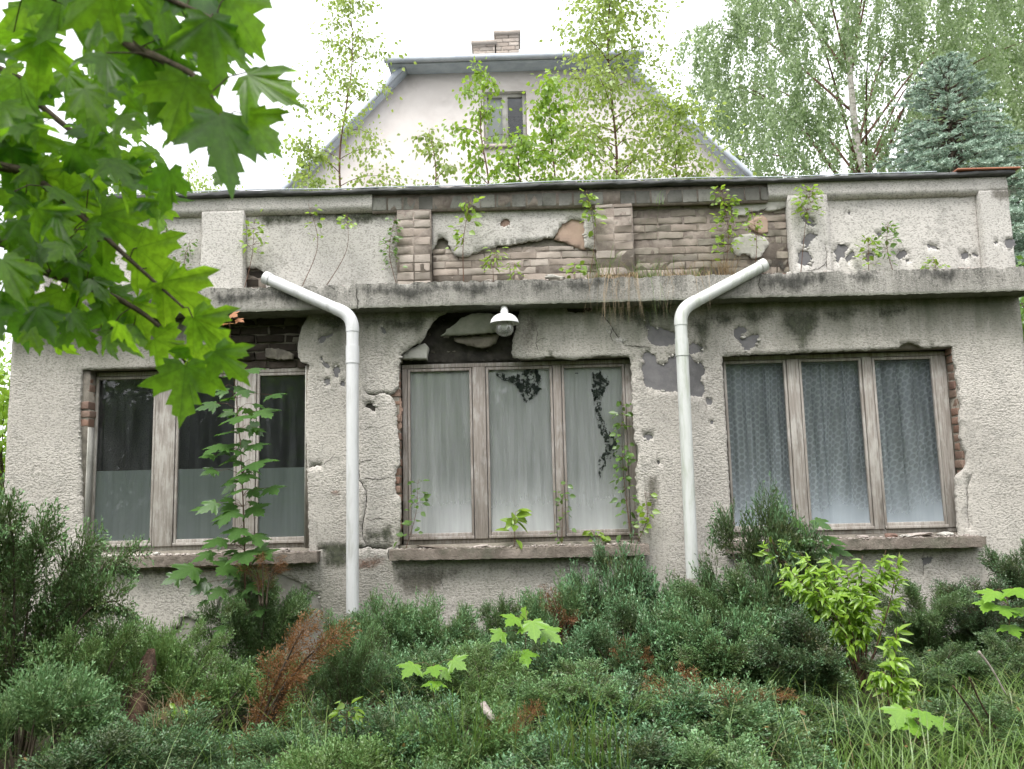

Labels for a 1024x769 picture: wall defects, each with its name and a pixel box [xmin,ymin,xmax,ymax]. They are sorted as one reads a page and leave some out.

flaking render [798,216,817,266]
flaking render [831,243,874,263]
flaking render [641,320,712,405]
flaking render [734,326,760,352]
crack [359,460,389,559]